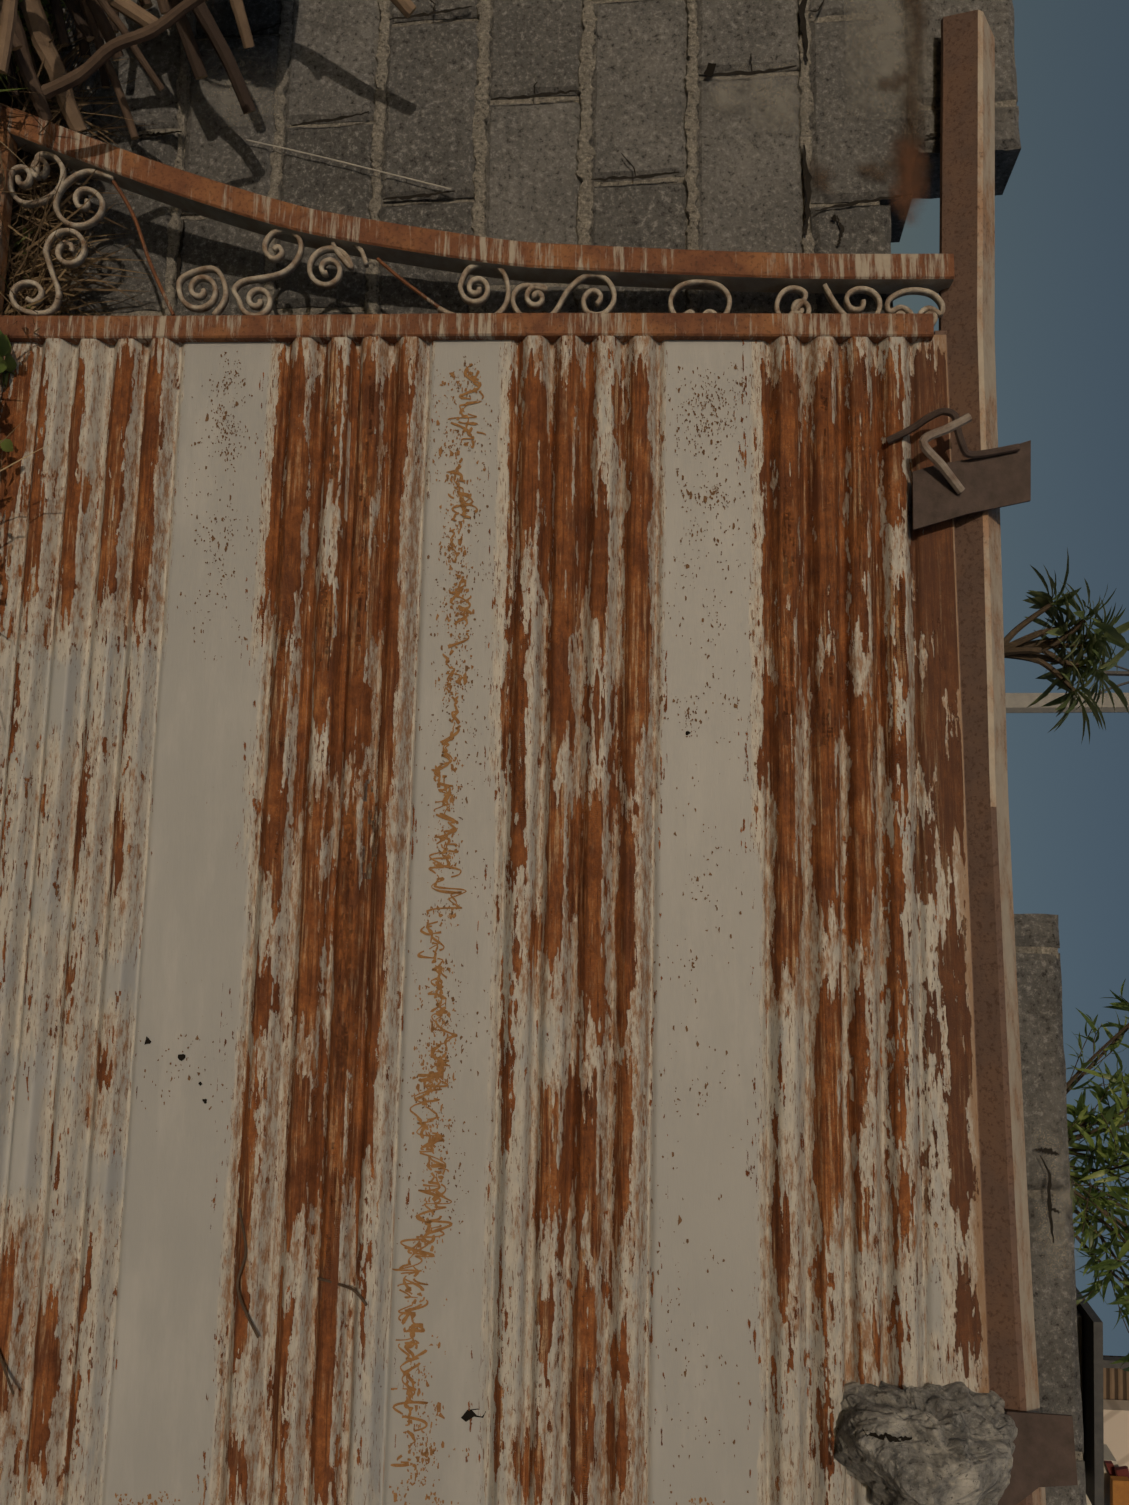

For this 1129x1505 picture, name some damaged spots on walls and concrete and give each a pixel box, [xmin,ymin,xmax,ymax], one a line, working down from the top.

rust [0,338,185,1505]
peeling [389,1299,470,1505]
rust [206,335,668,1505]
peeling [397,953,497,1273]
peeling [408,356,505,953]
rust [734,335,987,1505]